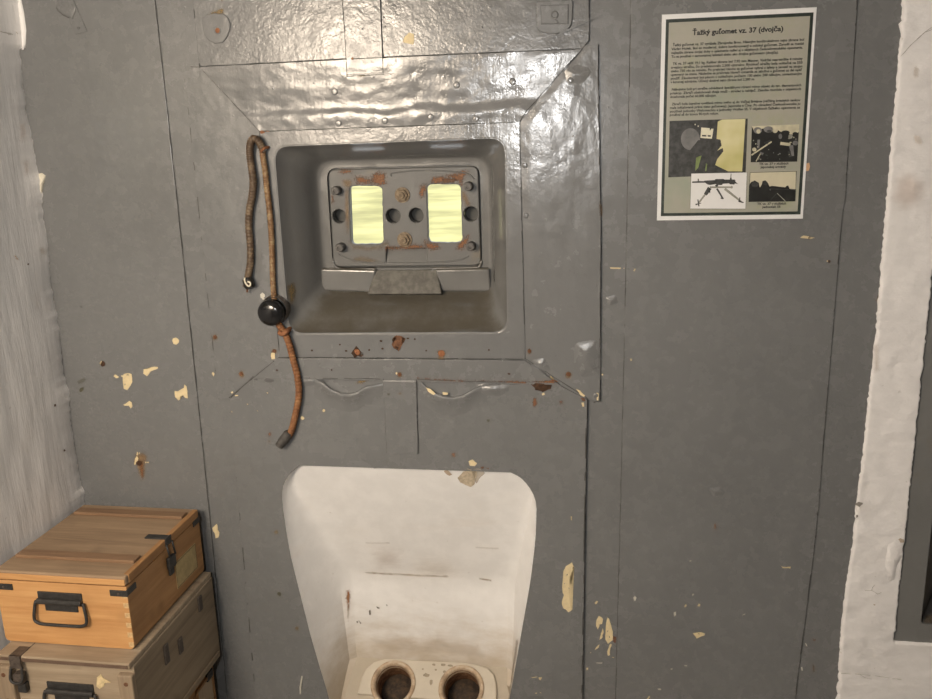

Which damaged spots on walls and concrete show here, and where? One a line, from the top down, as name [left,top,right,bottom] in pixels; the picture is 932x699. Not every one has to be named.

rust [340,169,387,185]
rust [419,171,466,198]
rust [384,239,439,251]
rust [392,335,405,351]
peeling [114,373,132,390]
peeling [175,385,188,400]
spalling [444,460,489,487]
peeling [562,563,574,612]
peeling [590,616,616,658]